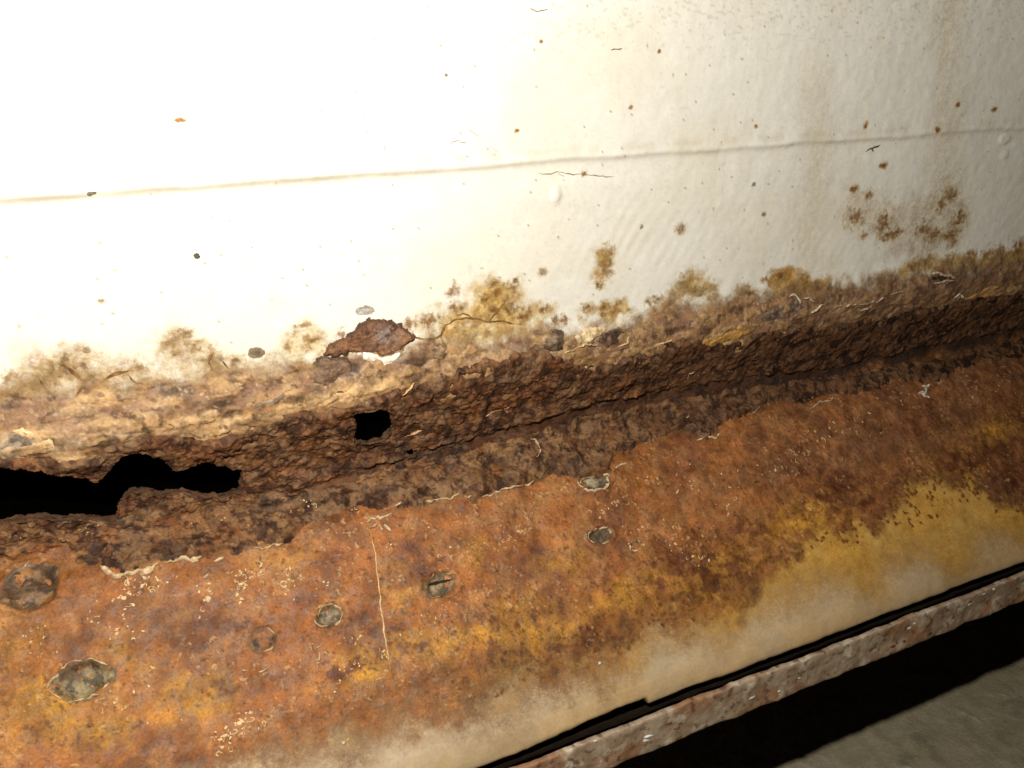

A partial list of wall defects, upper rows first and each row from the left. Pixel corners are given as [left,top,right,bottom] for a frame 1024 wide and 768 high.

crack [410,299,514,346]
corrosion [0,185,1024,463]
spalling [0,280,1024,640]
corrosion [0,332,1024,768]